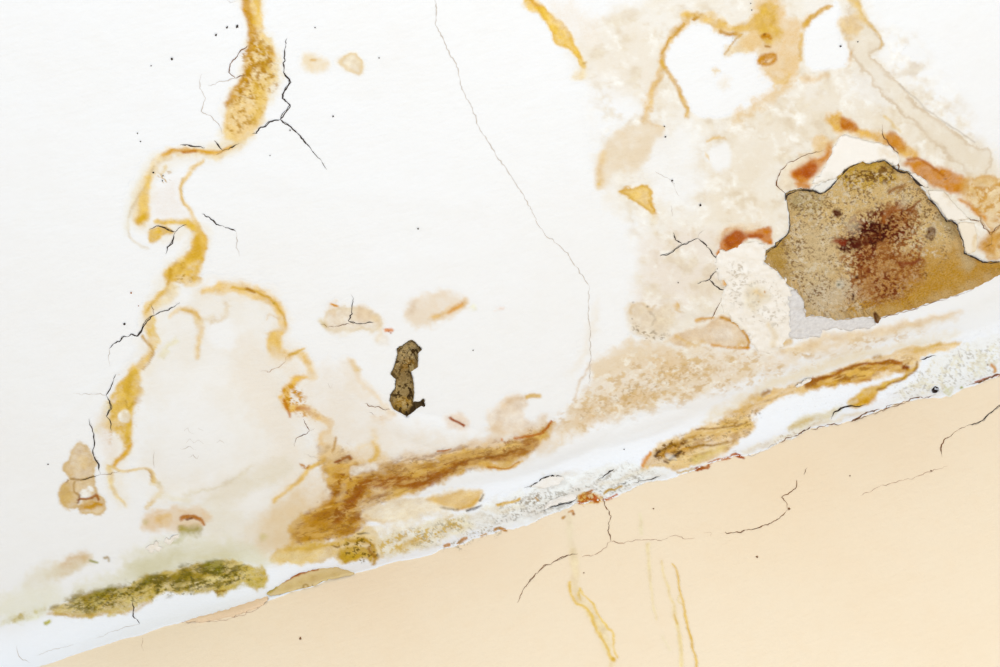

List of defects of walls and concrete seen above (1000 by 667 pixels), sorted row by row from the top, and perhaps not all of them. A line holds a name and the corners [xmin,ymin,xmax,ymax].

crack [184,39,325,167]
crack [76,304,175,480]
leakage [0,0,569,629]
spalling [390,340,425,417]
crack [435,5,591,382]
rust [711,218,775,257]
leakage [519,0,1000,474]
flaking render [738,409,870,457]
spalling [714,134,1000,354]
rust [773,108,1000,262]
flaking render [886,326,1000,409]
crack [519,468,807,599]